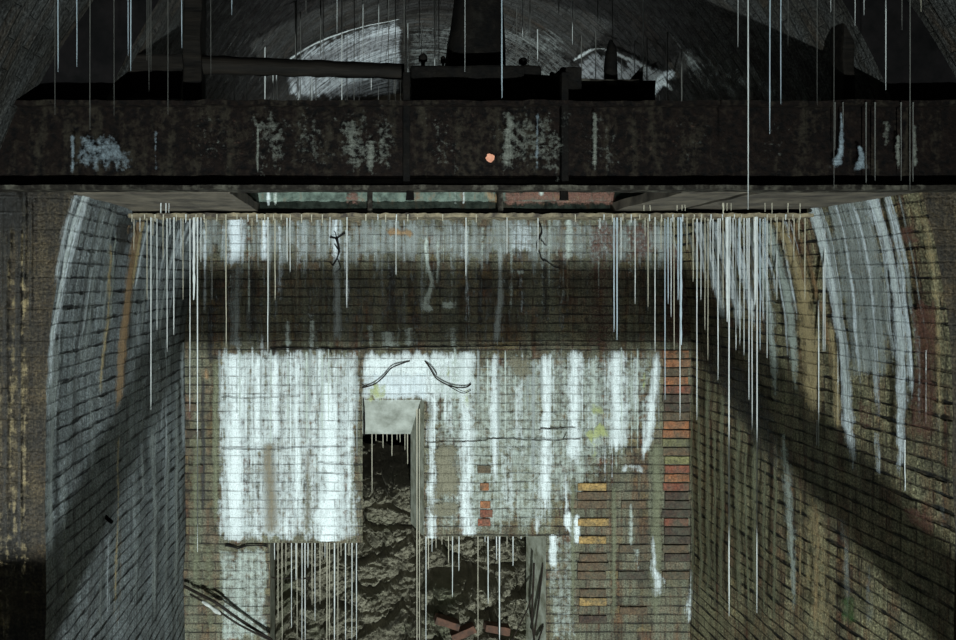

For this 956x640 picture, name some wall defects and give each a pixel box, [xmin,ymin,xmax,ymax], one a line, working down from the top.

efflorescence [71,136,128,169]
crack [330,231,346,273]
crack [536,222,565,269]
efflorescence [809,197,924,465]
damp [129,220,677,639]